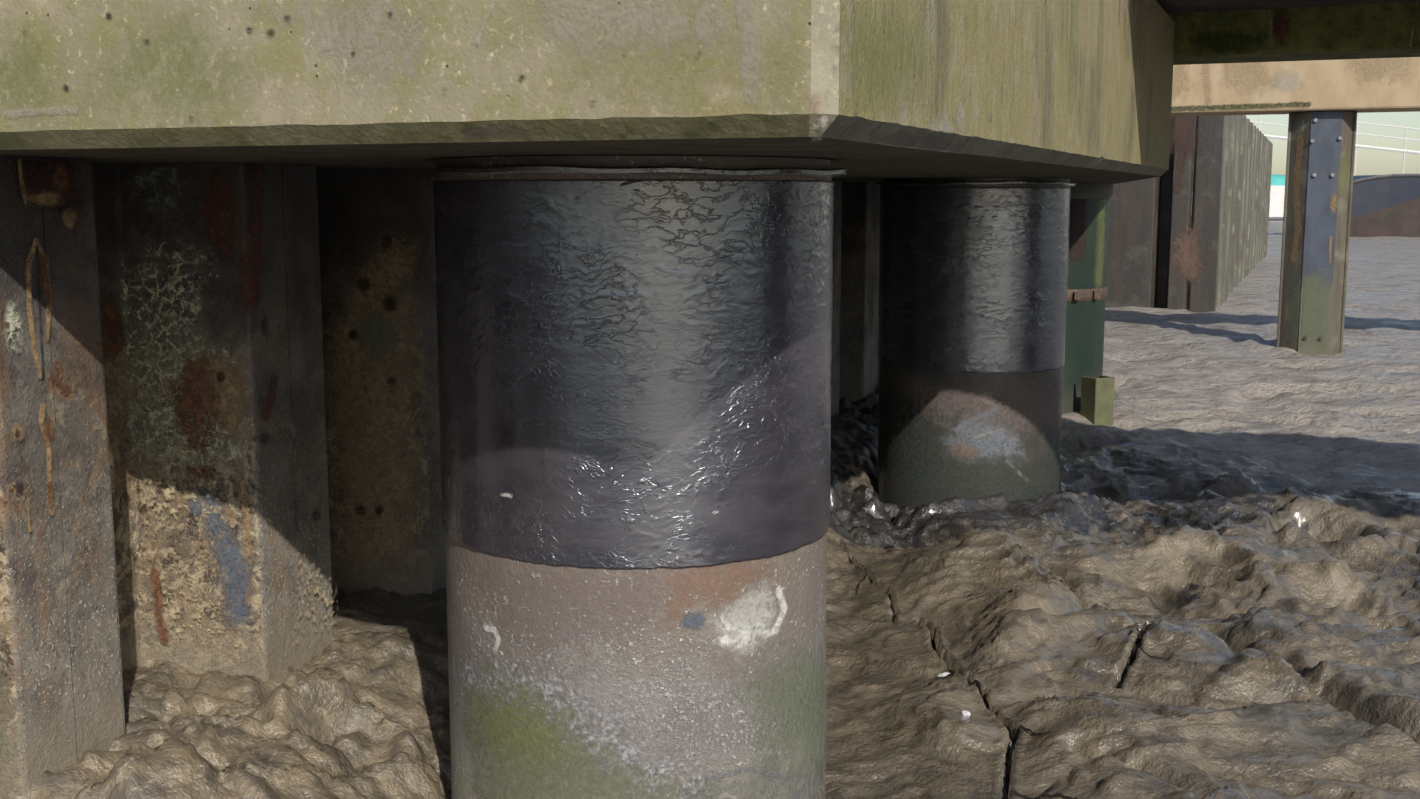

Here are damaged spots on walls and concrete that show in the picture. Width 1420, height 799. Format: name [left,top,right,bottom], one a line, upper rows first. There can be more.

corrosion [1291,135,1303,263]
peeling [719,634,737,646]